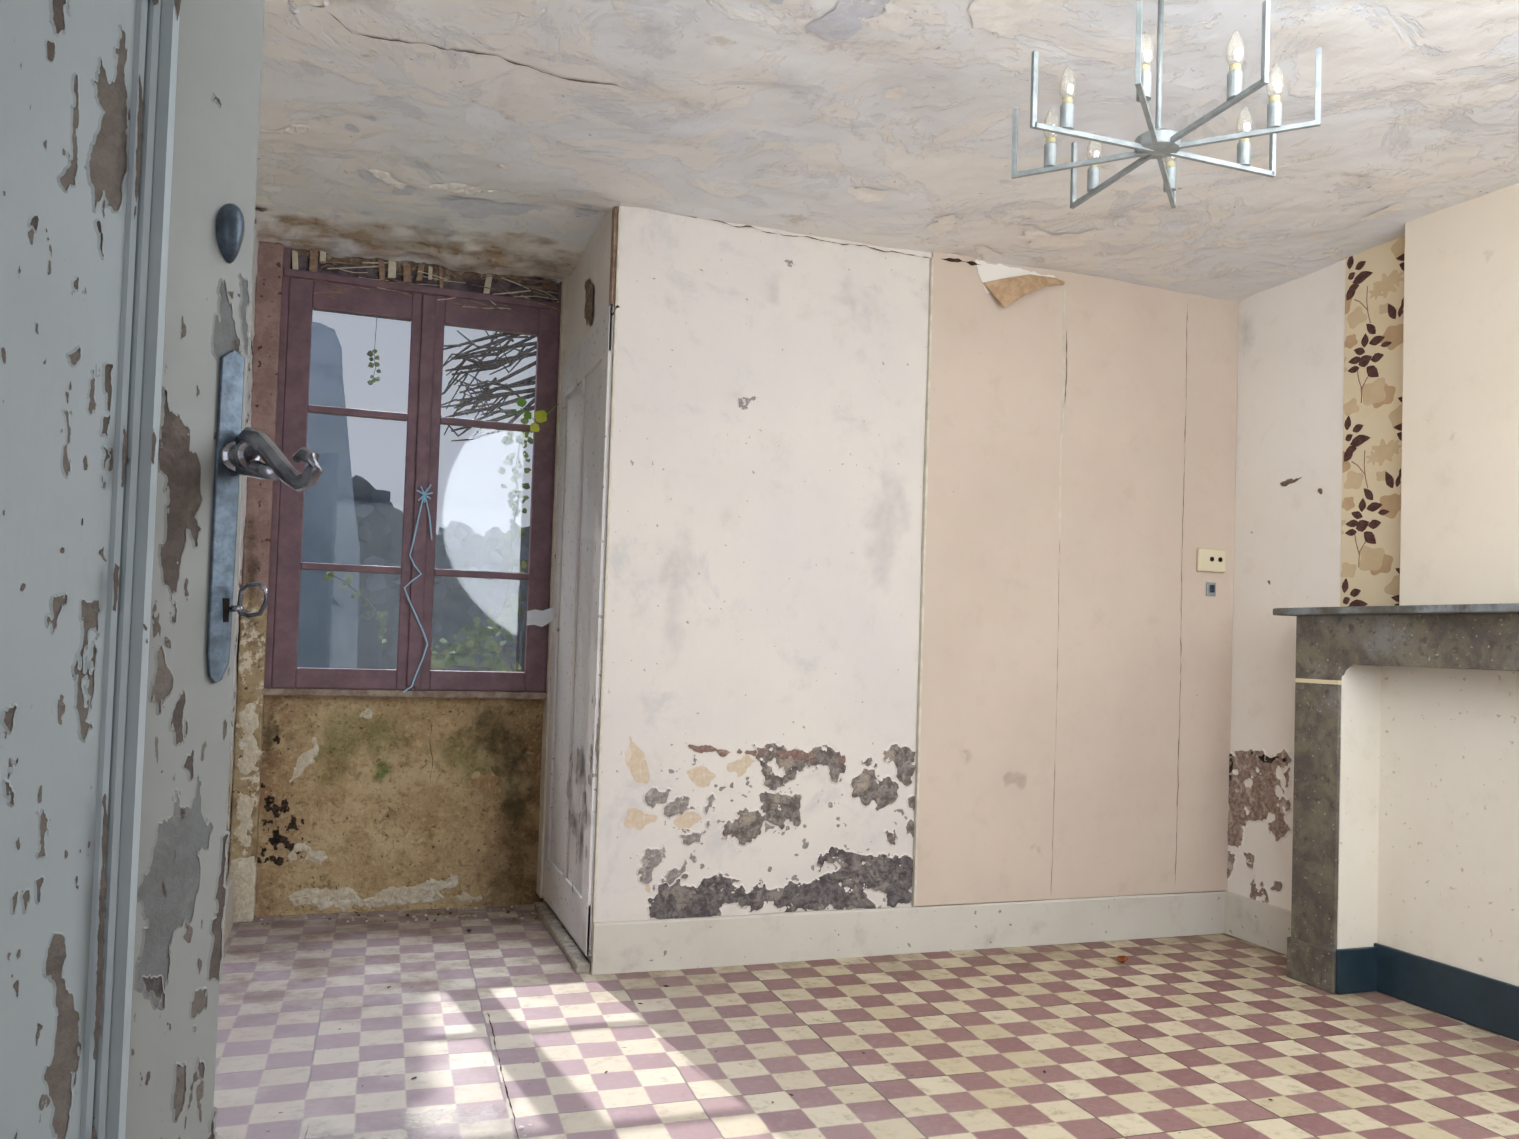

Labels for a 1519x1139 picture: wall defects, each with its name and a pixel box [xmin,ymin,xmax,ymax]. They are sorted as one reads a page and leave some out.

crack [289,0,625,89]
peeling [44,24,144,261]
peeling [59,345,127,490]
peeling [211,273,253,422]
leakage [282,218,521,270]
spalling [291,248,562,313]
peeling [44,546,119,743]
peeling [134,387,327,1033]
peeling [36,794,108,1139]
peeling [288,874,483,912]
spalling [624,736,916,920]
spalling [1227,747,1294,904]